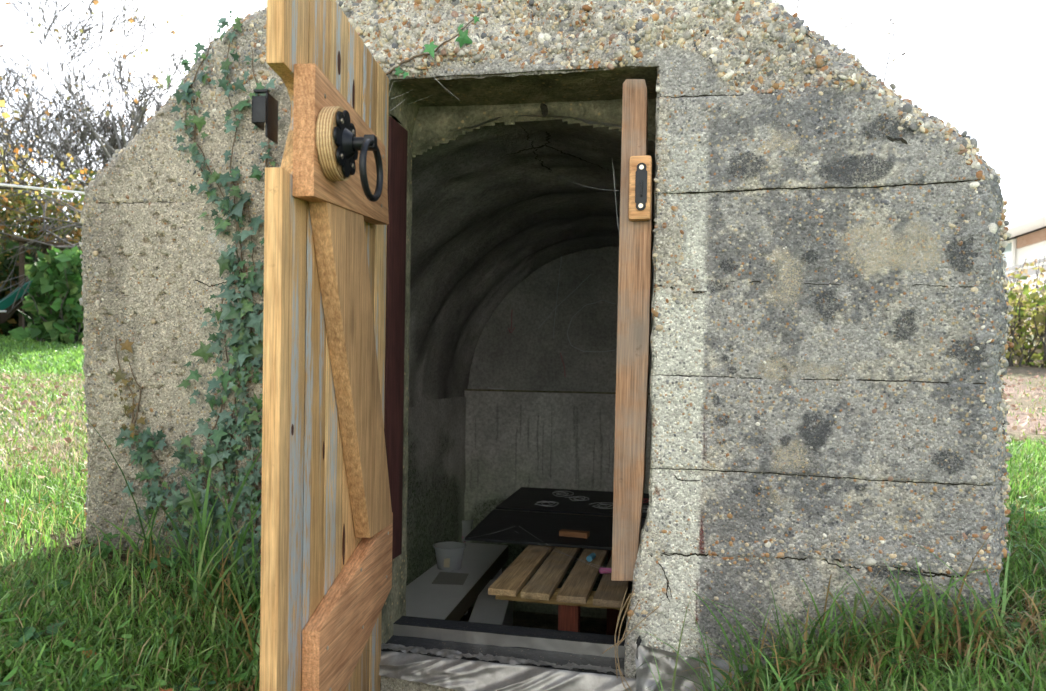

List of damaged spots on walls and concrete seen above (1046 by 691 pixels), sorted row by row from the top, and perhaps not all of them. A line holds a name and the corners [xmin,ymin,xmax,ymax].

damp [862,114,913,139]
damp [728,152,764,179]
damp [819,155,893,184]
damp [945,233,978,272]
damp [709,259,738,295]
damp [815,290,840,321]
damp [894,310,916,341]
damp [942,338,1001,364]
damp [780,413,836,447]
damp [931,450,965,473]
crack [648,553,718,602]
crack [776,557,963,578]